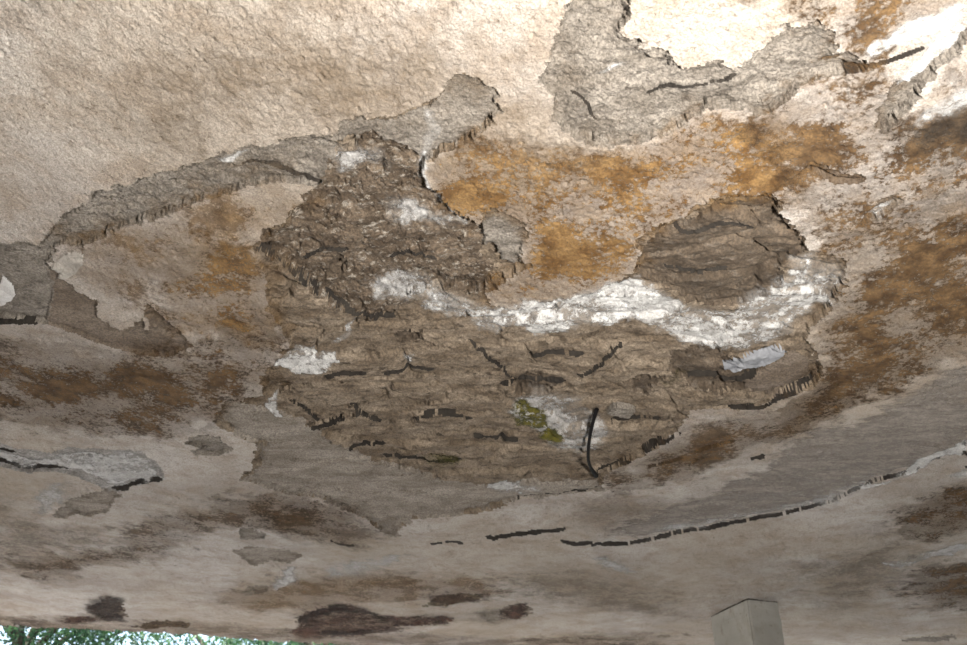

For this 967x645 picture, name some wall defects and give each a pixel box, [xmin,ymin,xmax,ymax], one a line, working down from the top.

water stain [296,51,396,109]
spalling [537,0,874,149]
spalling [874,28,967,134]
water stain [337,151,367,171]
water stain [375,0,967,494]
crack [0,315,38,325]
spalling [0,72,850,538]
crack [430,539,463,547]
crack [485,439,967,547]